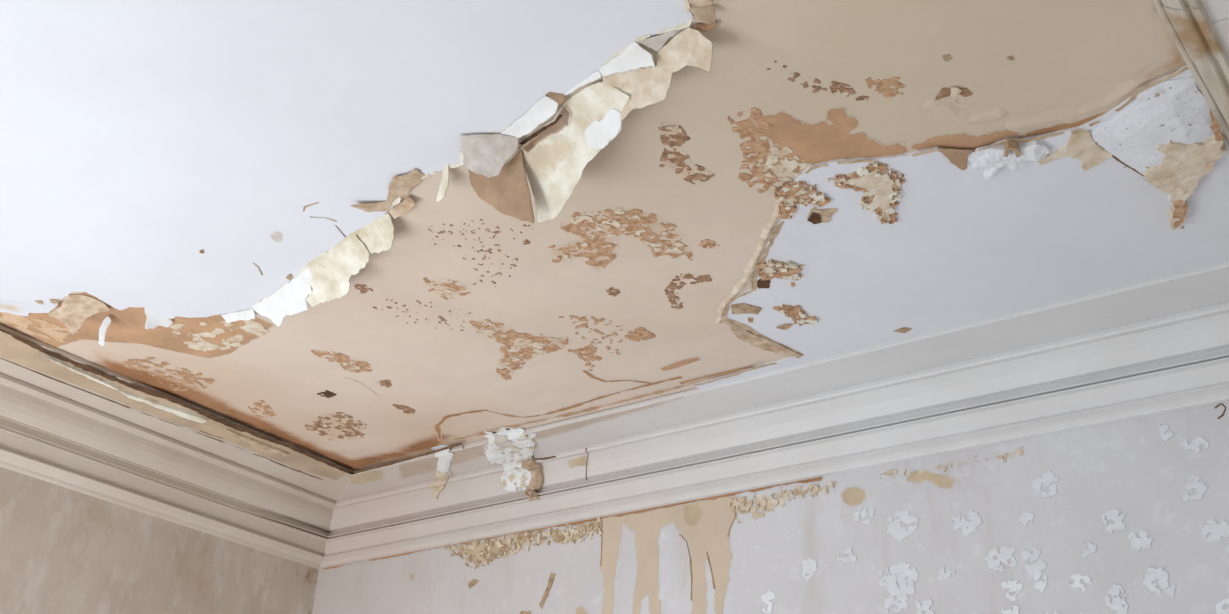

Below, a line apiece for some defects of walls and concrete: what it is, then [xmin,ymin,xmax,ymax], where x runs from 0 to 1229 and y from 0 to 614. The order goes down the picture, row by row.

flaking render [35,0,1227,502]
peeling [728,479,845,523]
damp [839,485,866,509]
damp [904,470,958,491]
peeling [441,517,603,589]
damp [575,495,738,614]
peeling [854,506,919,541]
peeling [1102,509,1153,553]
peeling [877,562,935,614]
peeling [984,545,1048,614]
peeling [1068,573,1129,614]